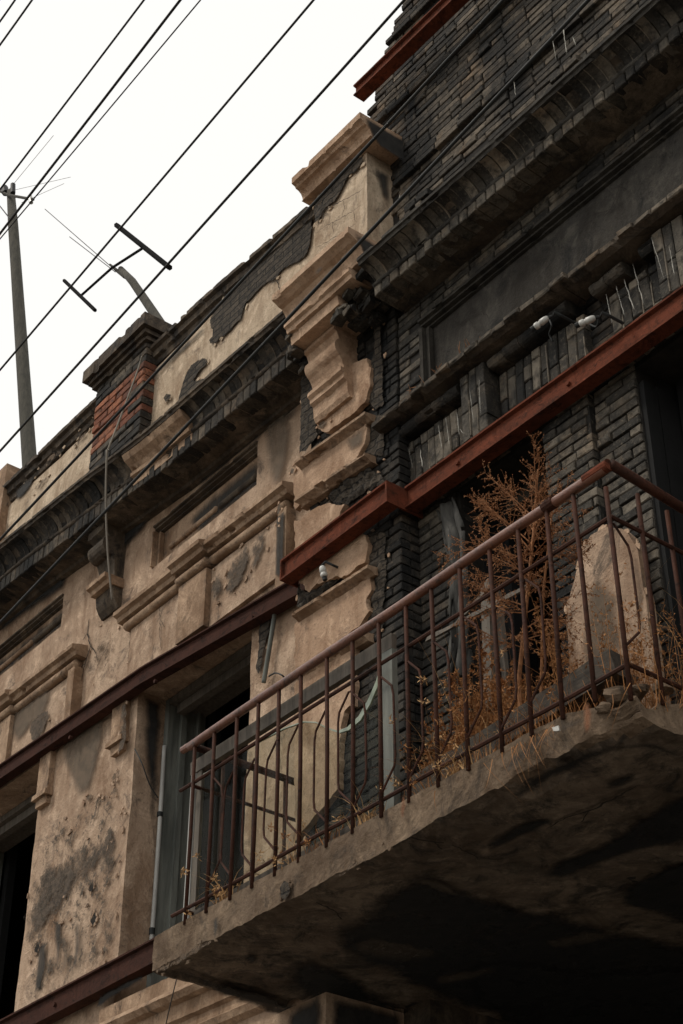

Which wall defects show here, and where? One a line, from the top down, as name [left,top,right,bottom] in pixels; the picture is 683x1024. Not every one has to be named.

spalling [209,154,366,347]
spalling [163,358,210,404]
spalling [285,333,333,475]
spalling [326,268,391,505]
spalling [296,579,338,608]
spalling [367,529,390,632]
damp [36,922,79,990]